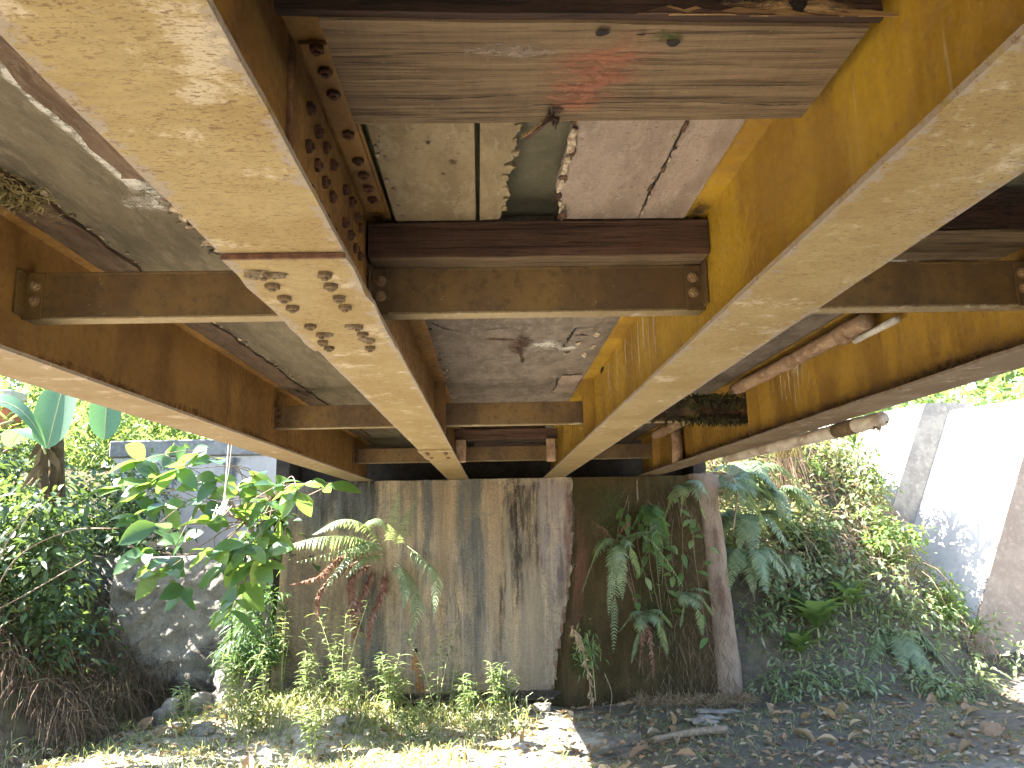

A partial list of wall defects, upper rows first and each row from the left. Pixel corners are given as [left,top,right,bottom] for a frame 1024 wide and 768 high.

damp [0,68,168,209]
peeling [556,121,578,221]
crack [344,62,807,215]
spalling [551,373,583,393]
damp [284,558,313,685]
damp [321,478,571,702]